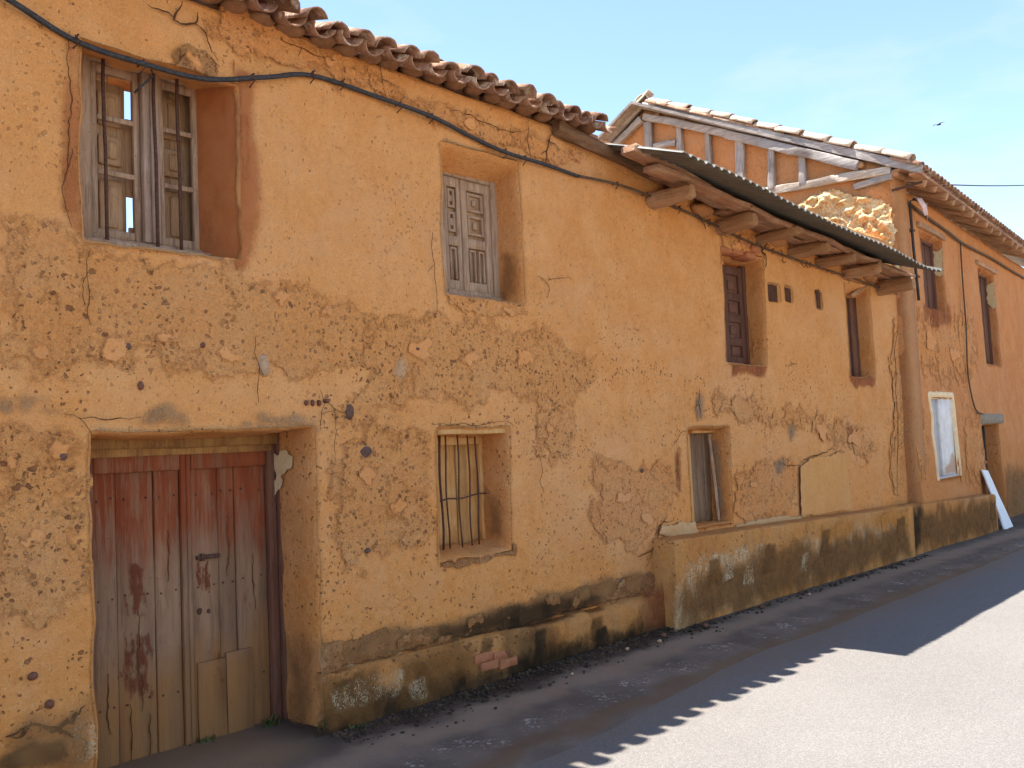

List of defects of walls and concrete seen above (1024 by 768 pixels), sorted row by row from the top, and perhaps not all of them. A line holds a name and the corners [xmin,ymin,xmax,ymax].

crack [62,31,73,227]
crack [64,413,138,435]
flaking render [0,215,596,578]
flaking render [588,454,681,554]
flaking render [712,386,877,464]
crack [781,446,843,493]
leakage [319,469,1024,736]
crack [5,705,86,739]